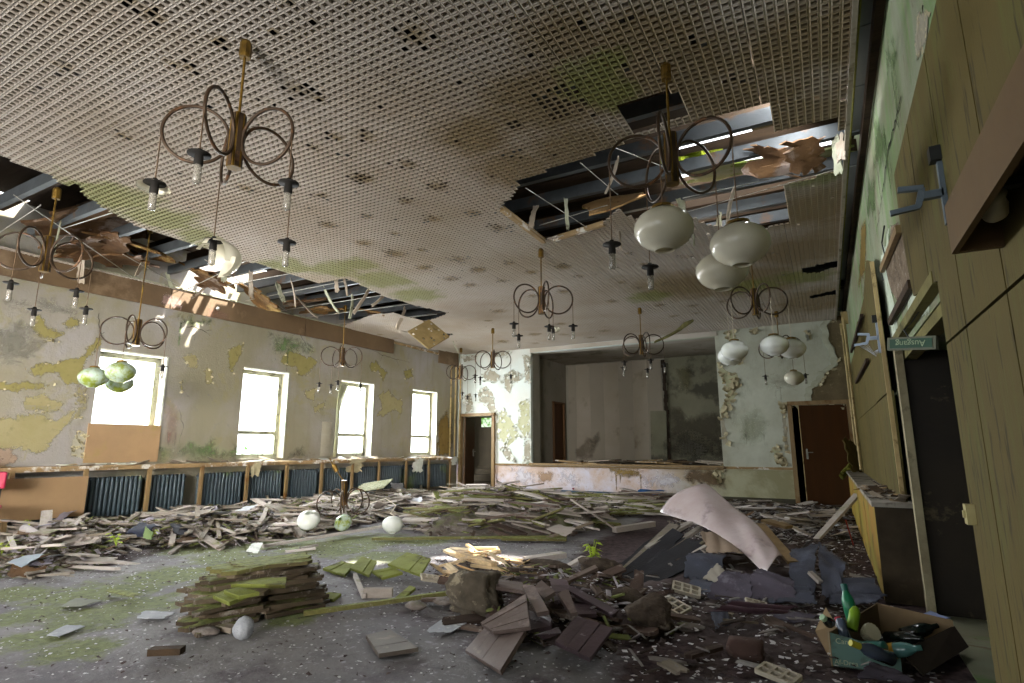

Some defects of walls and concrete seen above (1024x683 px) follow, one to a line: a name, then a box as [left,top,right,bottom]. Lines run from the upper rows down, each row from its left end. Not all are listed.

peeling [915,6,931,60]
peeling [0,335,104,454]
peeling [31,315,82,343]
peeling [281,351,317,376]
peeling [333,384,348,457]
peeling [461,350,532,464]
leakage [672,409,723,457]
peeling [717,356,746,447]
flaking render [770,311,852,467]